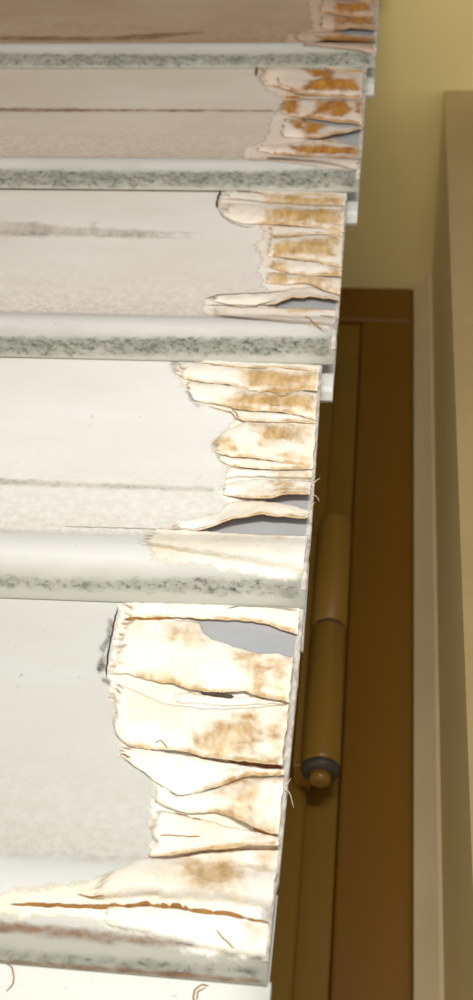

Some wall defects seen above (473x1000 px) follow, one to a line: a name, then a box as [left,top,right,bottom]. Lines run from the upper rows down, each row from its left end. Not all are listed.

peeling [284,0,379,56]
peeling [243,66,367,180]
peeling [202,190,347,349]
peeling [143,360,322,590]
peeling [0,602,304,961]
crack [162,812,201,837]
crack [11,894,269,949]